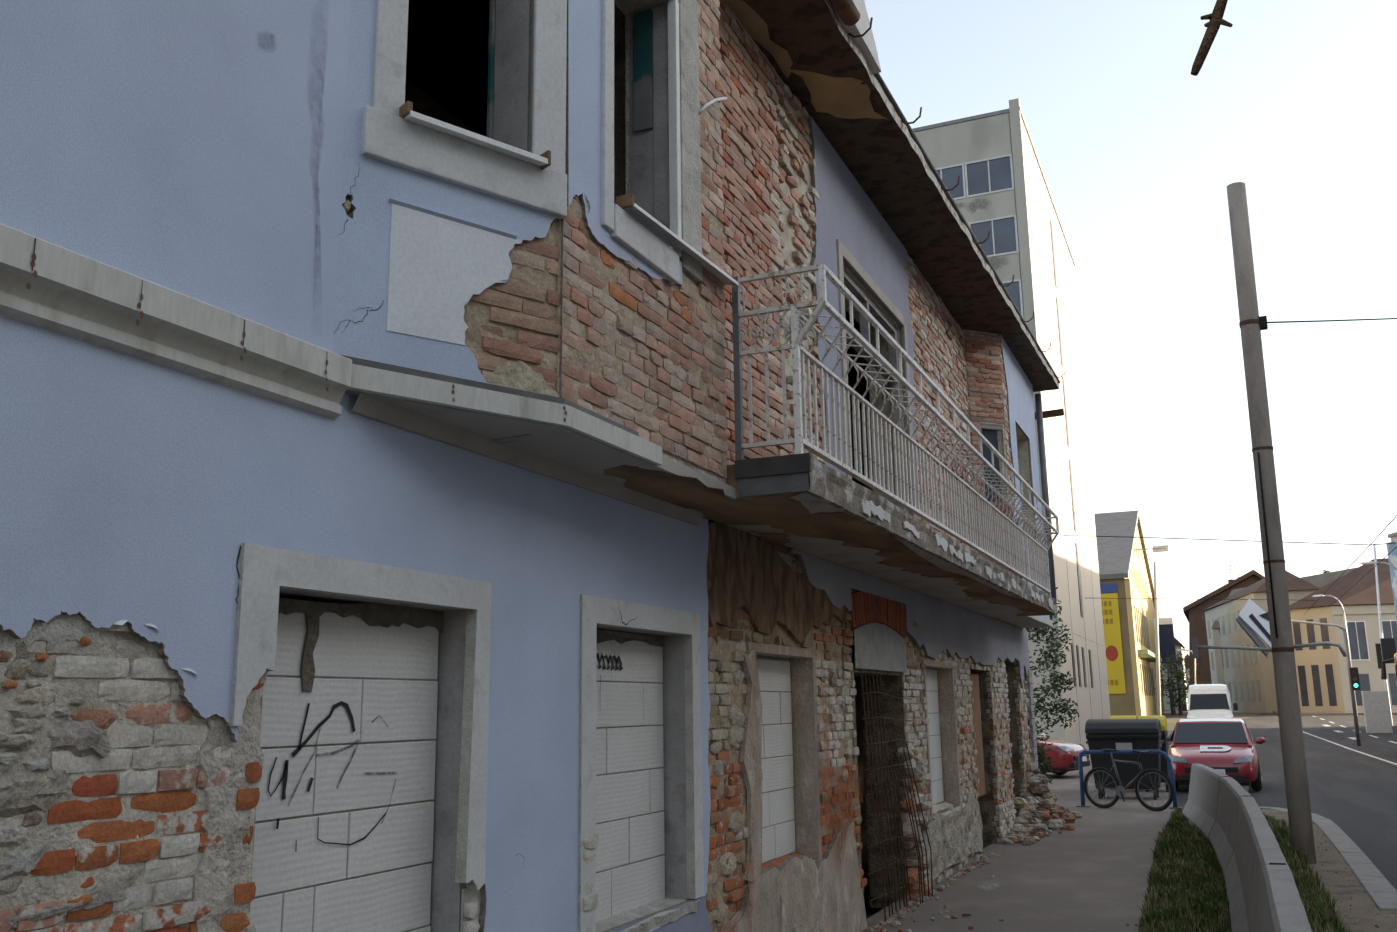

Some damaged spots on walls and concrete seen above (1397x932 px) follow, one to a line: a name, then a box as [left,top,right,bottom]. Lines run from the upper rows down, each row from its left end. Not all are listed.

crack [334,300,384,334]
spalling [464,0,1053,932]
spalling [0,613,269,932]
spalling [460,888,481,932]